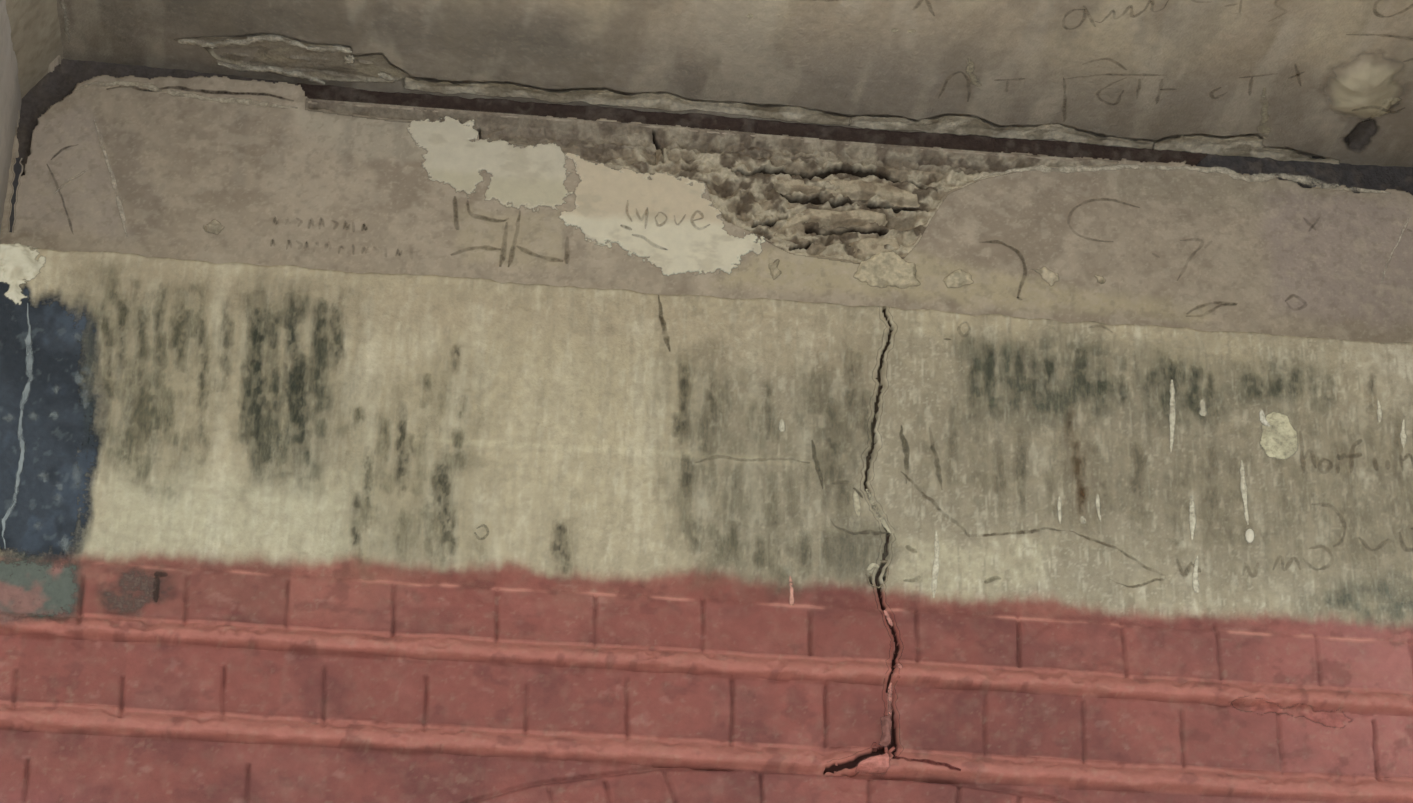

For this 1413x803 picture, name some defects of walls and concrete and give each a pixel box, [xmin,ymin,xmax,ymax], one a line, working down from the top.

spalling [75,34,1389,288]
flaking render [0,243,46,305]
crack [2,303,33,549]
damp [102,282,203,477]
damp [244,297,340,464]
damp [384,422,407,475]
damp [434,436,461,544]
crack [812,306,961,777]
damp [969,342,1122,427]
crack [983,529,1121,551]
damp [1151,362,1211,417]